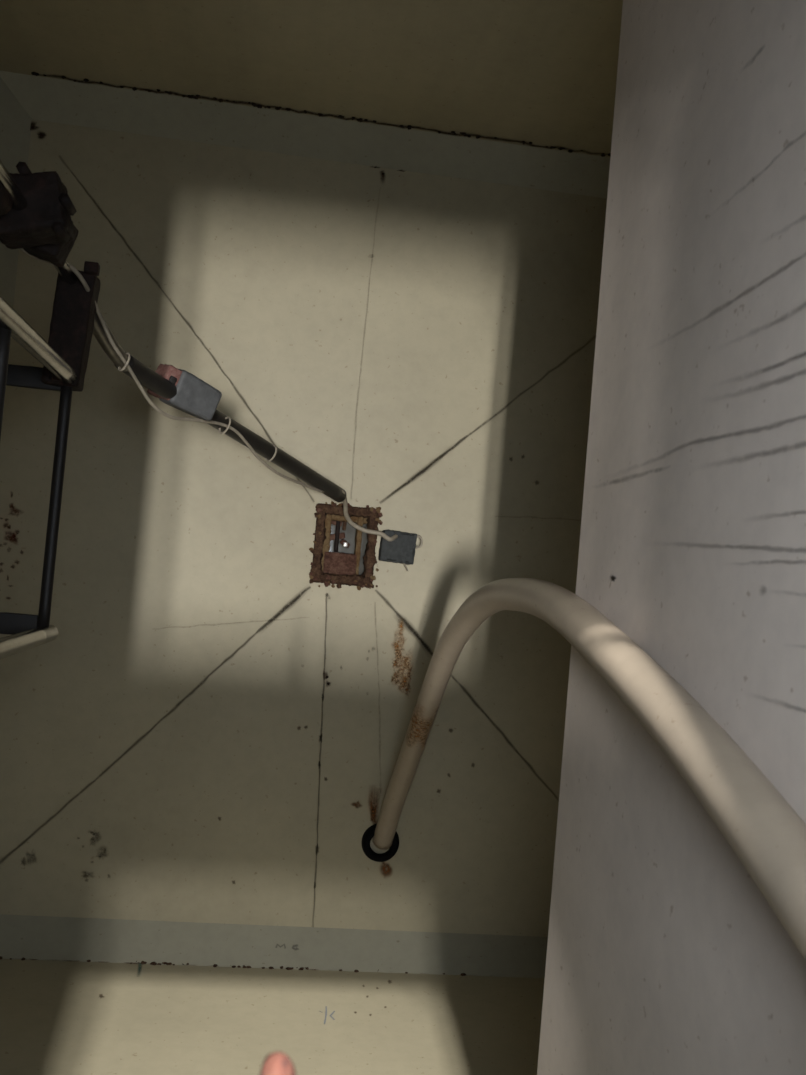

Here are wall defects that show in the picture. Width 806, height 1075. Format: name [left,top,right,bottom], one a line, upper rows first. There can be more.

rust [392,622,412,694]